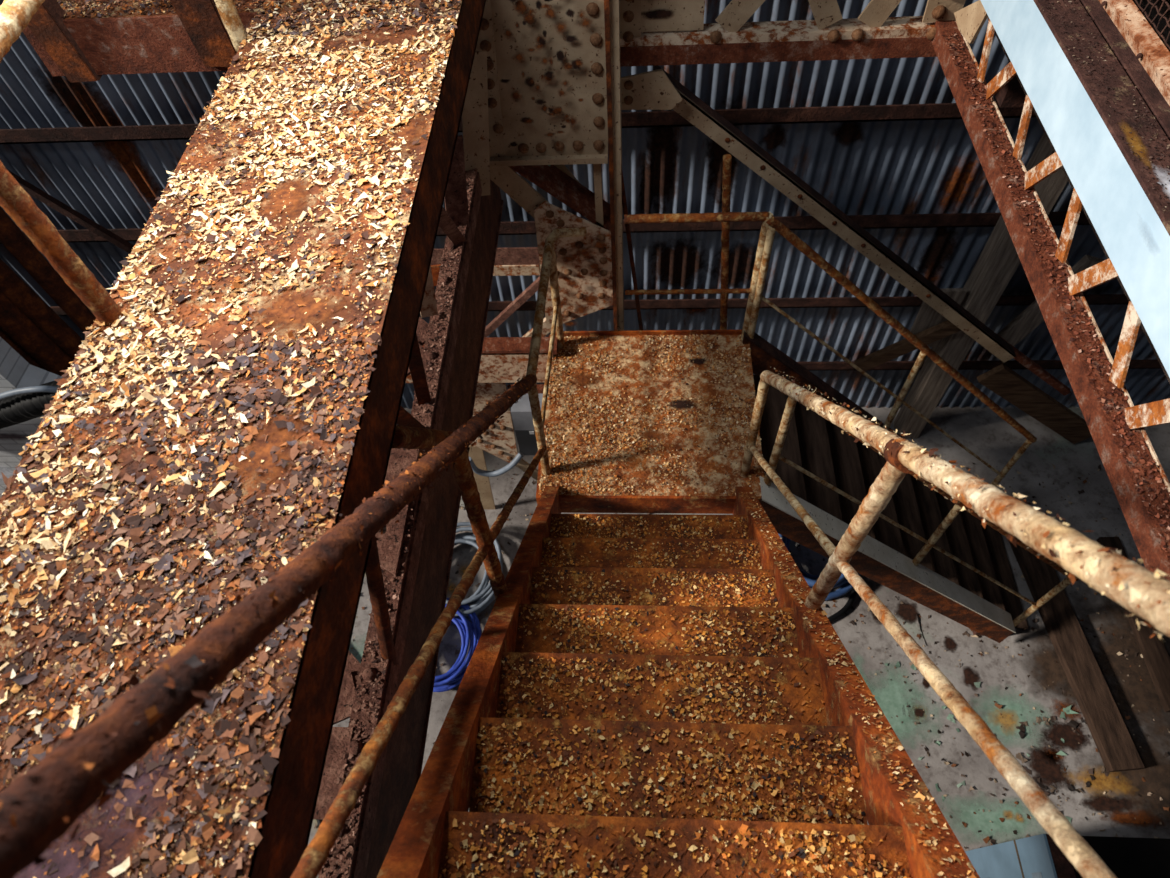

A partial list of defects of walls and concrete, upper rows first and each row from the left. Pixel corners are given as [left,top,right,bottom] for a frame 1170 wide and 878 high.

corrosion [39,64,123,127]
corrosion [159,0,459,282]
corrosion [500,0,590,147]
corrosion [651,239,756,288]
corrosion [920,155,979,283]
corrosion [39,251,180,431]
corrosion [195,231,385,444]
corrosion [139,371,243,497]
corrosion [218,468,345,601]
corrosion [538,280,979,878]
corrosion [0,577,175,763]
corrosion [158,796,244,878]